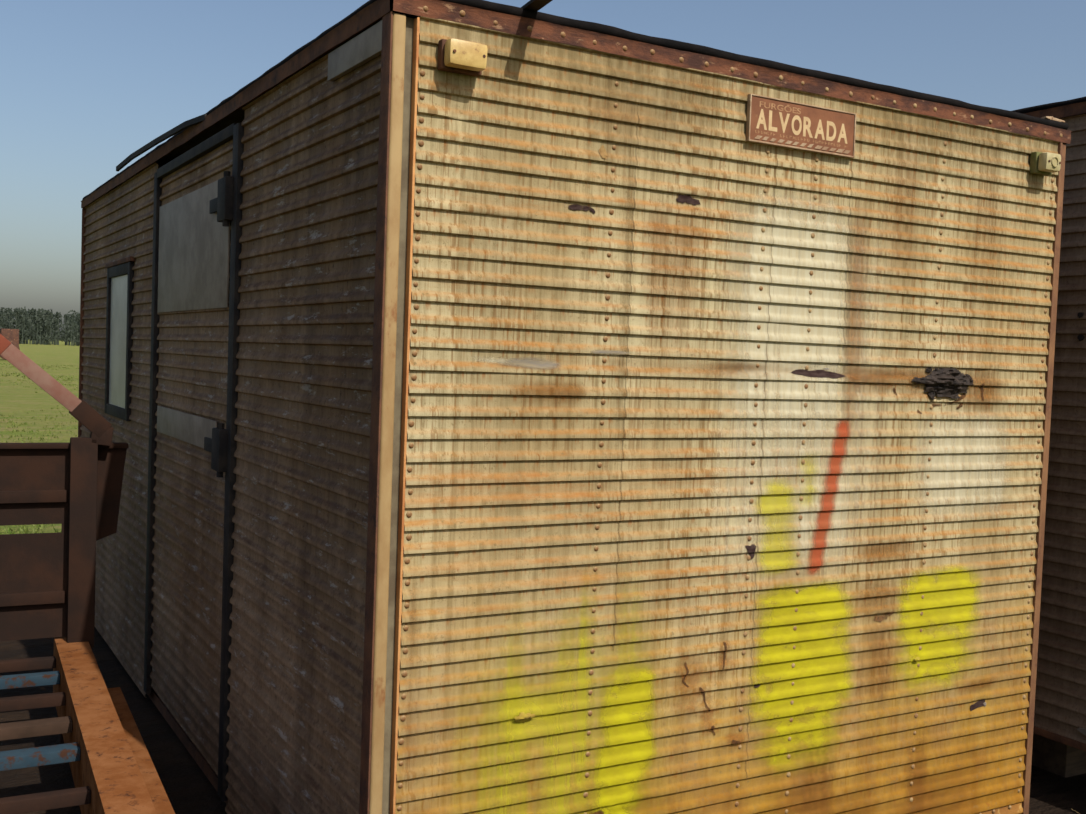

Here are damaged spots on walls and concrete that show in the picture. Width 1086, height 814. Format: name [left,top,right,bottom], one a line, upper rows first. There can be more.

peeling [676,194,700,205]
peeling [569,204,595,213]
peeling [791,368,846,378]
peeling [912,367,941,400]